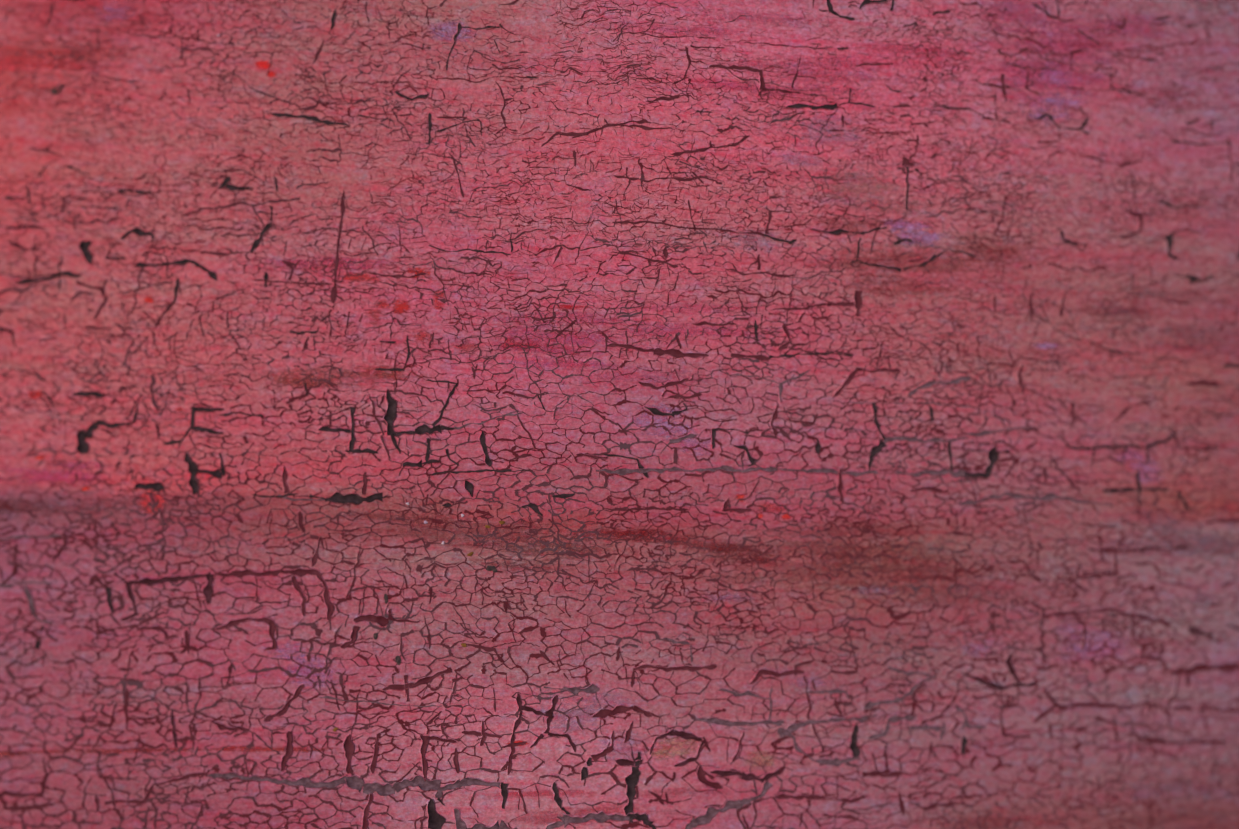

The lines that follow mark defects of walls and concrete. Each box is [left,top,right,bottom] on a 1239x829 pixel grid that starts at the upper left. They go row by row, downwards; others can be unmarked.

crack [813,0,951,29]
crack [987,0,1087,22]
crack [270,10,1239,278]
crack [1120,201,1239,304]
crack [0,147,331,495]
crack [82,289,1239,829]
crack [0,736,81,811]